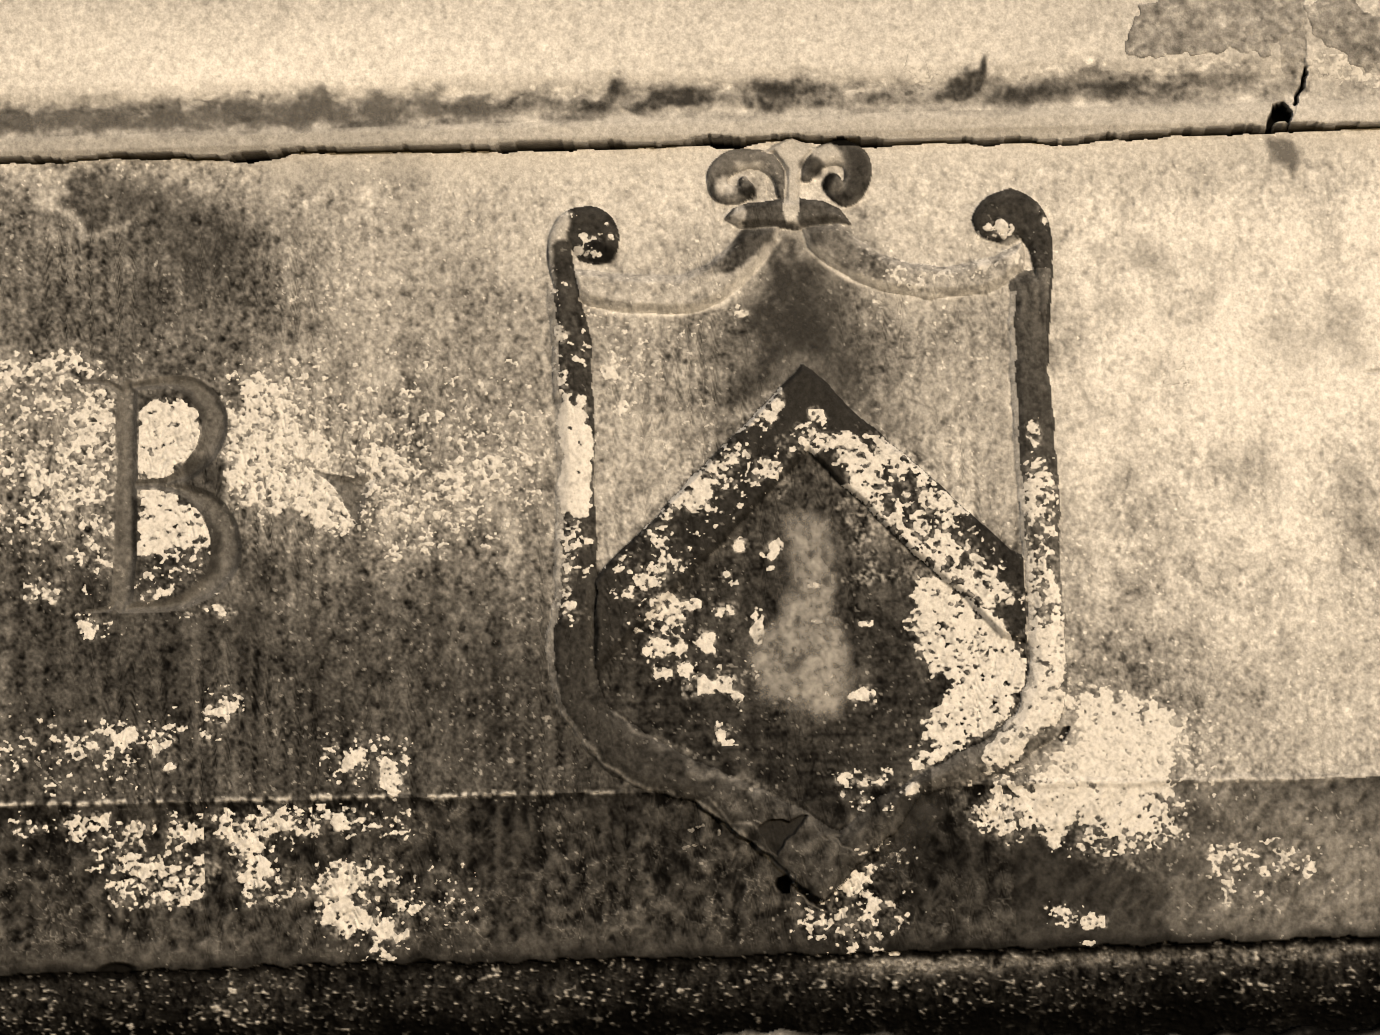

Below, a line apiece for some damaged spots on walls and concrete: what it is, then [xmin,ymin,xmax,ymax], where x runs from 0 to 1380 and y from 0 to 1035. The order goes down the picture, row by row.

peeling [1125,0,1380,88]
leakage [753,239,825,351]
leakage [752,516,847,714]